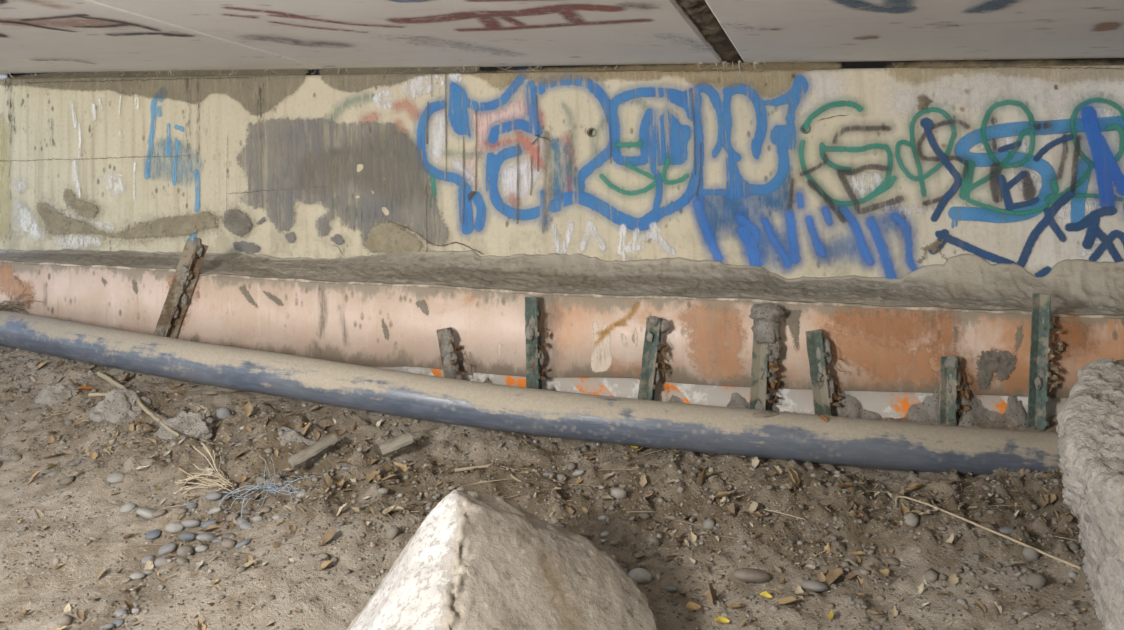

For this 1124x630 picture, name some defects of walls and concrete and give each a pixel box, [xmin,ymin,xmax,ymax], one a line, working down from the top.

rust [0,263,34,308]
rust [596,303,639,343]